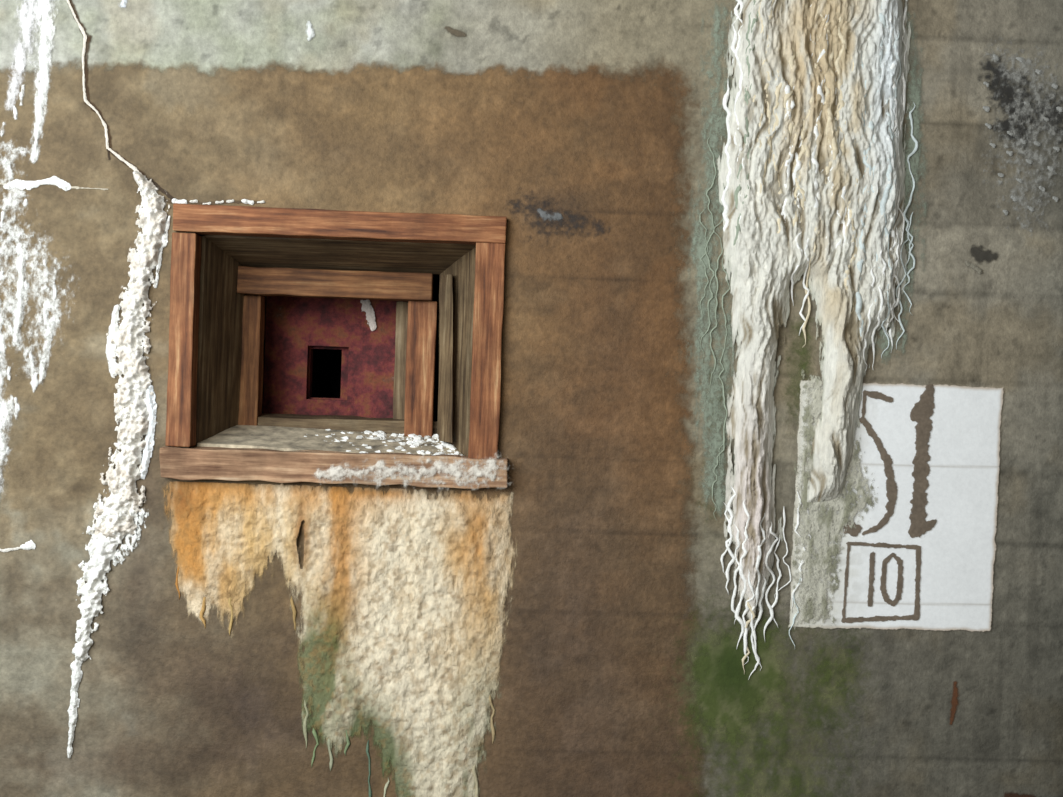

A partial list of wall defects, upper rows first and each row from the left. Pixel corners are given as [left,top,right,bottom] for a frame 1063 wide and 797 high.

crack [67,0,265,205]
damp [0,0,707,797]
damp [691,0,925,680]